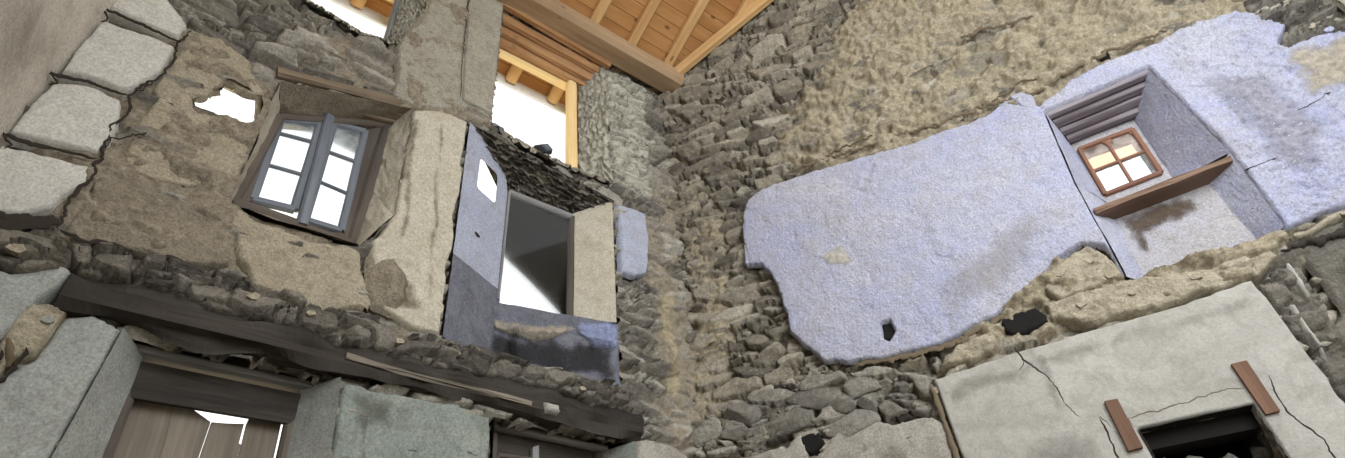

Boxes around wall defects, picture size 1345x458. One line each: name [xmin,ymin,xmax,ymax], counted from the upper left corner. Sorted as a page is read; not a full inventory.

spalling [1243,0,1345,91]
flaking render [1009,92,1037,107]
crack [1281,222,1345,252]
spalling [1045,210,1345,403]
crack [0,347,29,383]
spalling [690,332,999,458]
crack [853,310,1336,458]